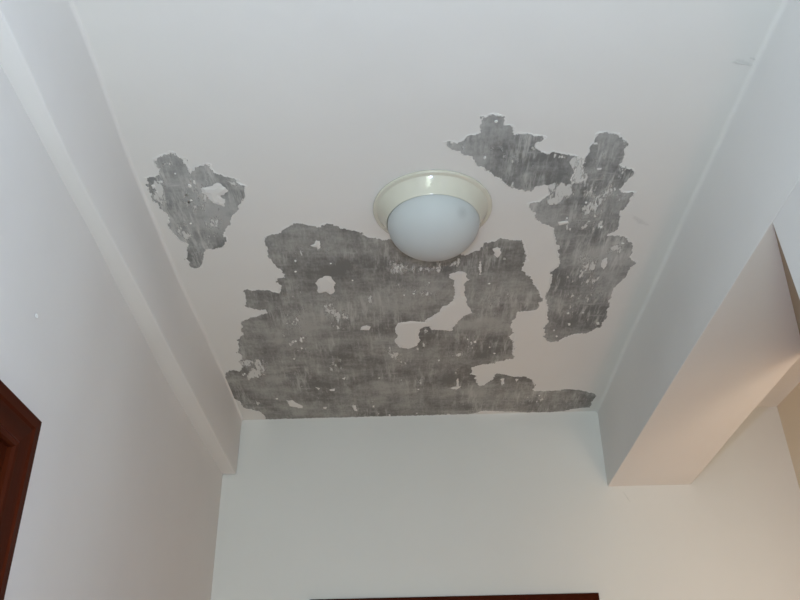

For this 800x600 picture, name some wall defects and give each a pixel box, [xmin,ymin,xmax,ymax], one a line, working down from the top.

peeling [144,151,248,269]
peeling [225,113,638,420]